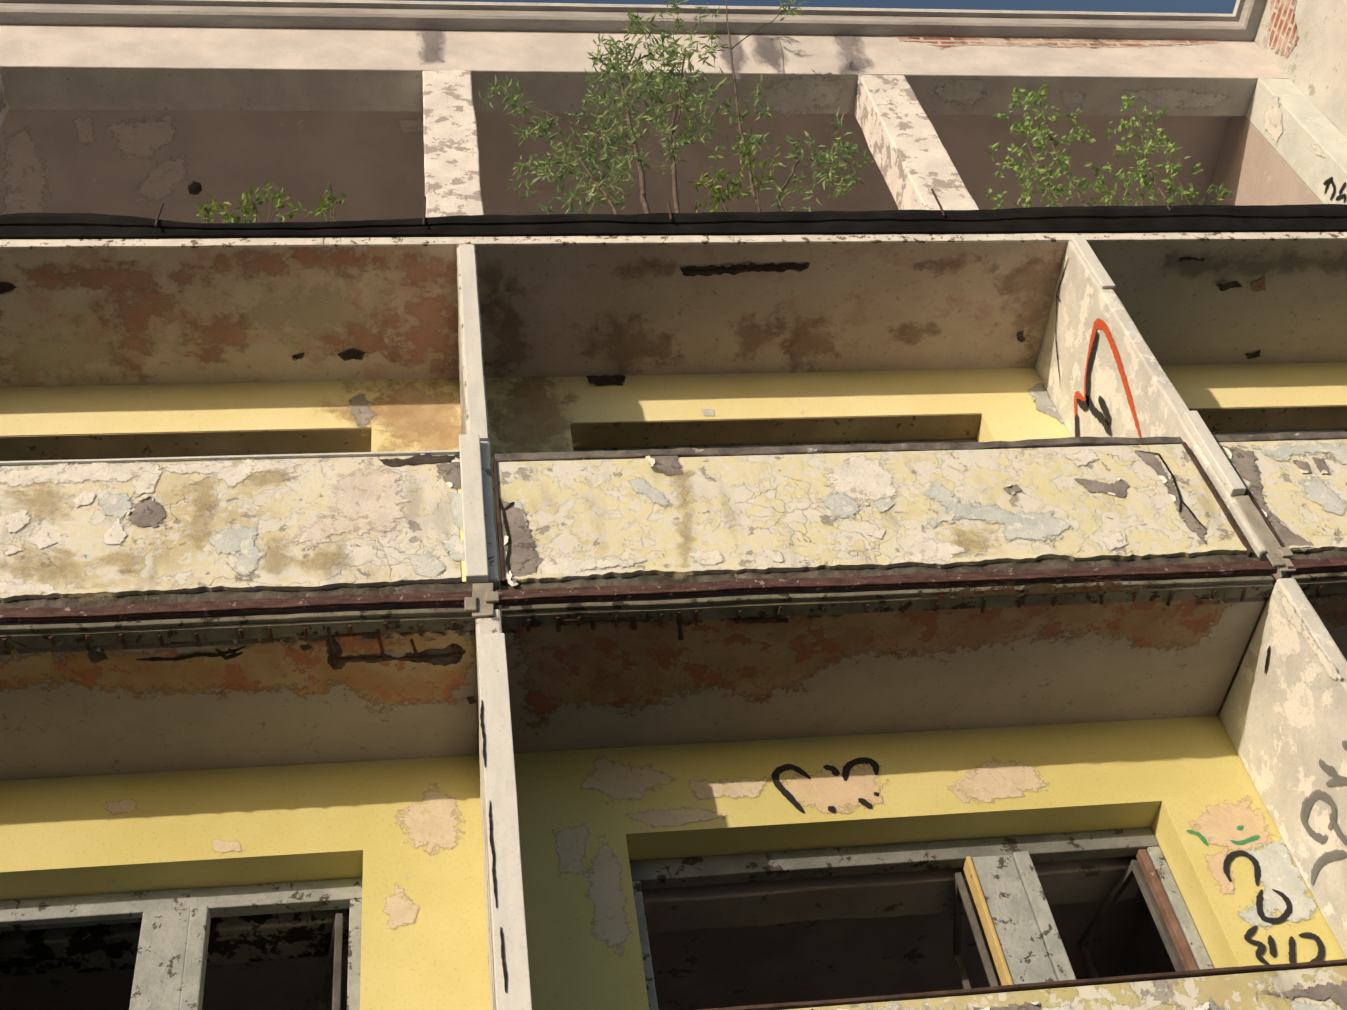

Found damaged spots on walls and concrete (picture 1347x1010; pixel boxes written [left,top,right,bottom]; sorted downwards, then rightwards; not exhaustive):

flaking render [1267,0,1298,58]
spalling [0,282,17,295]
spalling [680,261,810,277]
spalling [1221,442,1347,560]
peeling [0,454,474,608]
peeling [493,450,1260,735]
peeling [1278,586,1347,680]
peeling [948,757,1049,804]
peeling [394,783,465,860]
spalling [837,1000,1073,1010]
peeling [1193,996,1225,1010]
spalling [1262,981,1347,1010]